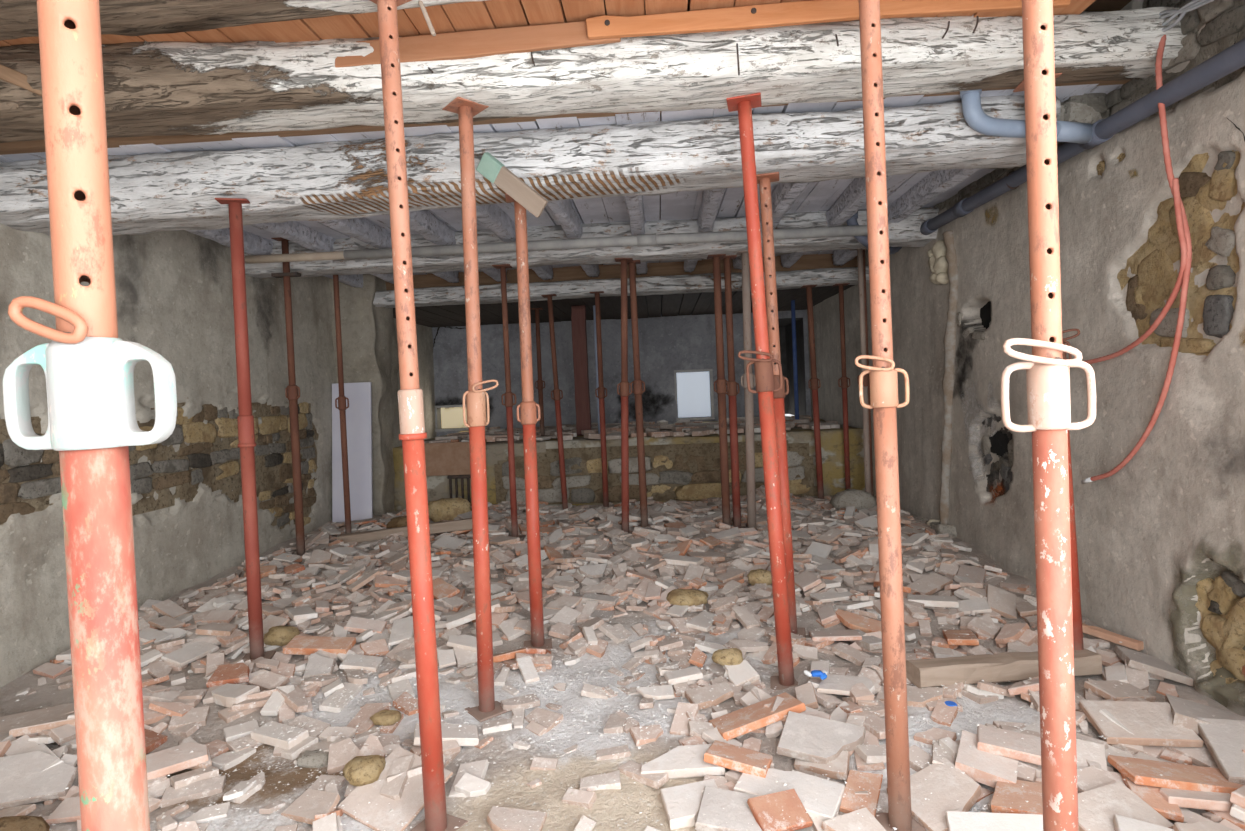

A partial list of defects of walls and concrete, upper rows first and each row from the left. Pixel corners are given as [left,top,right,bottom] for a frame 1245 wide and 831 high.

flaking render [1117,150,1245,356]
spalling [957,301,991,340]
flaking render [0,416,61,525]
flaking render [128,402,319,529]
flaking render [979,414,1013,496]
flaking render [1195,571,1245,686]